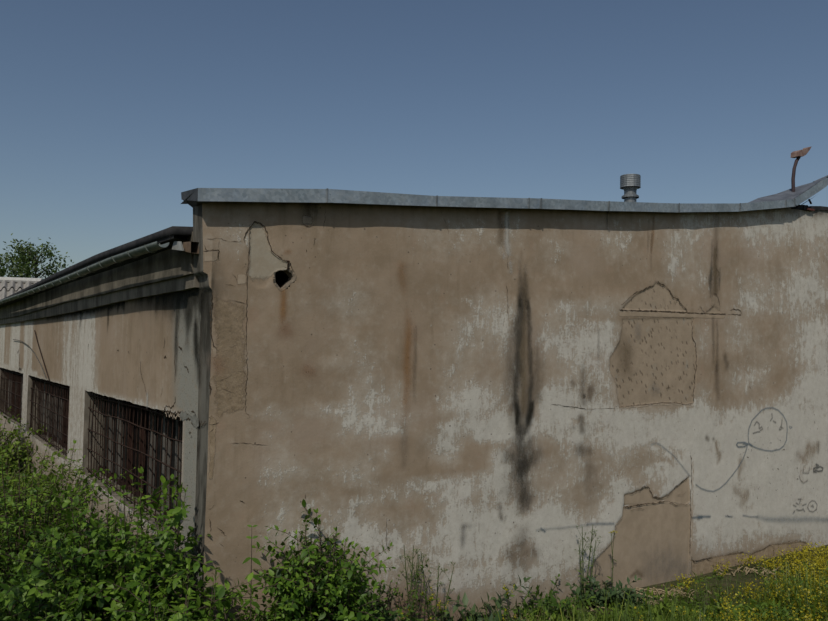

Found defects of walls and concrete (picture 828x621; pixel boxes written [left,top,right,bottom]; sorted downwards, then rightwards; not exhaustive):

spalling [237,221,297,291]
leakage [140,279,212,368]
spalling [619,281,741,319]
leakage [512,293,533,502]
spalling [602,476,690,552]